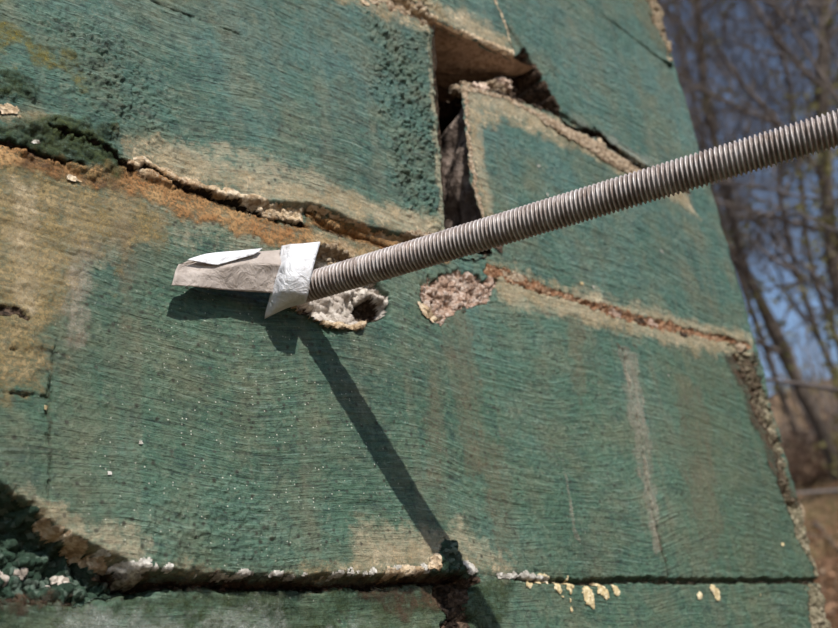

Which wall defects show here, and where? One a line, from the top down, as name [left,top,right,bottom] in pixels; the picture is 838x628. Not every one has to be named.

peeling [361,0,515,58]
crack [540,113,647,174]
crack [0,124,401,249]
spalling [313,242,351,270]
spalling [291,283,388,331]
spalling [418,263,831,628]
peeling [208,568,254,583]
crack [92,568,463,596]
peeling [264,570,308,581]
peeling [319,553,443,585]
crack [555,538,815,585]